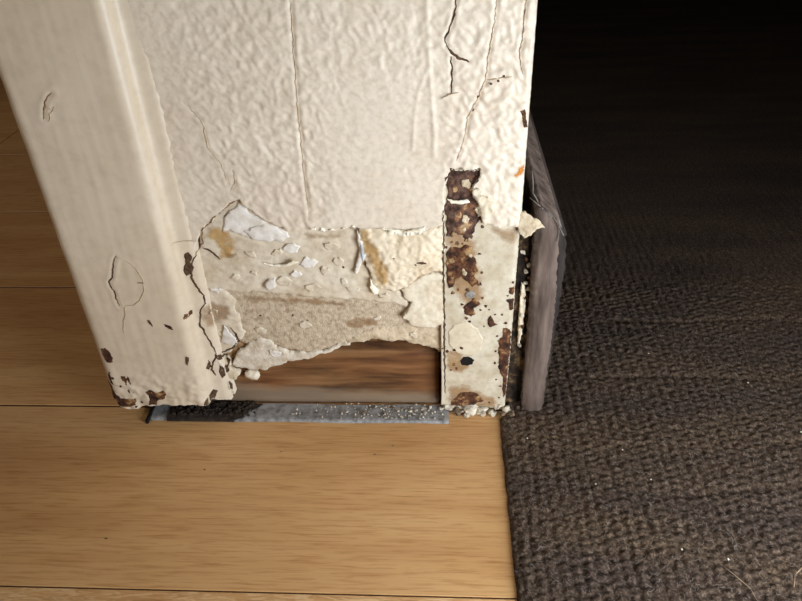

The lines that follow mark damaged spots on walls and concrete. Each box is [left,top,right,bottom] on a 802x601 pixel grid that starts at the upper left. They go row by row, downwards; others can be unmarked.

crack [443,0,527,161]
crack [108,256,145,330]
peeling [101,348,166,408]
crack [173,101,240,376]
spalling [183,199,483,394]
rust [442,168,515,406]
spalling [505,209,545,405]